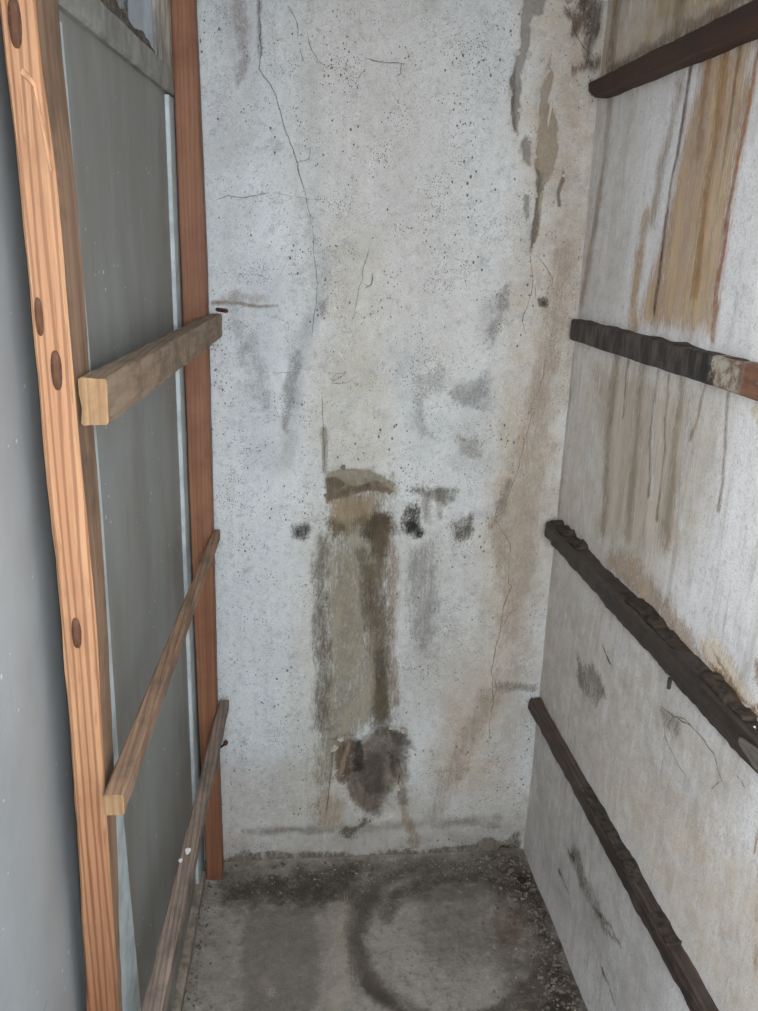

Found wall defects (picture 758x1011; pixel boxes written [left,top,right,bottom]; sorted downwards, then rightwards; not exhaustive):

crack [235,0,311,218]
corrosion [628,42,758,342]
damp [291,522,310,539]
damp [454,515,474,539]
damp [313,478,453,785]
damp [341,818,367,838]
damp [223,834,521,1011]
damp [456,862,581,1011]
damp [568,846,617,940]